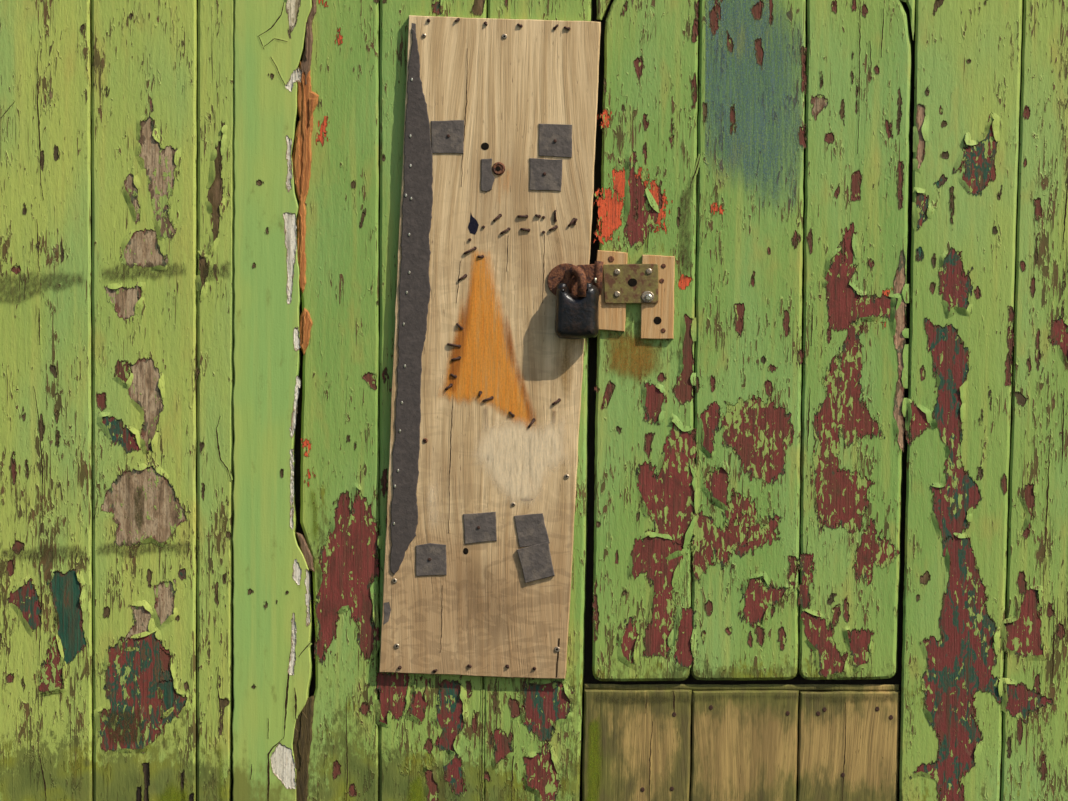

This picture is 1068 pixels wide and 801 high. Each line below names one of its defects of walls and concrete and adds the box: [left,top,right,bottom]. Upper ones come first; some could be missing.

peeling [104,97,181,321]
spalling [283,0,330,304]
peeling [594,113,681,252]
peeling [833,168,862,201]
peeling [885,85,1003,232]
peeling [6,540,87,697]
peeling [96,357,188,548]
peeling [94,568,192,753]
peeling [264,375,478,801]
peeling [484,679,575,801]
peeling [615,314,874,679]
peeling [807,222,1068,801]